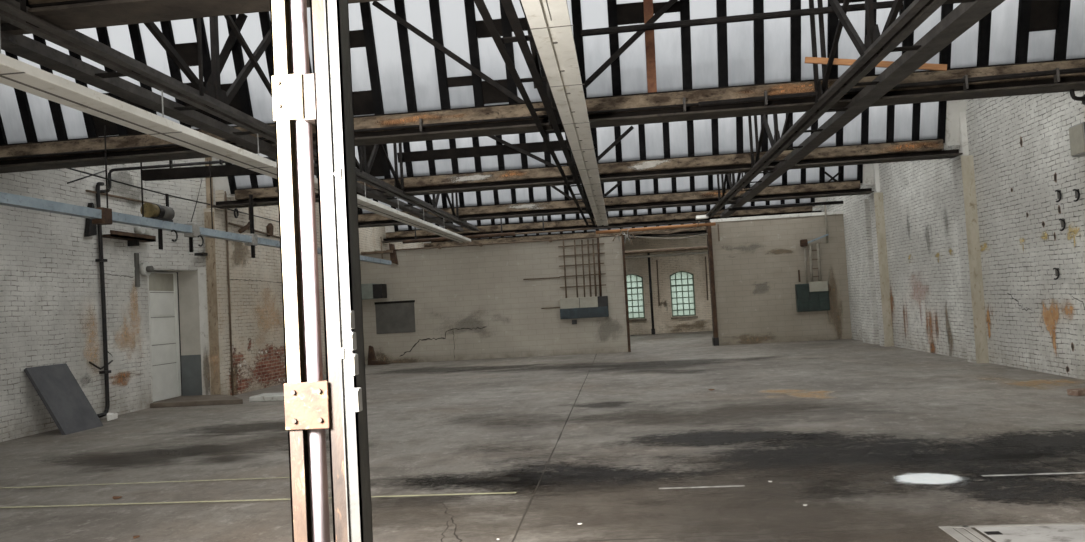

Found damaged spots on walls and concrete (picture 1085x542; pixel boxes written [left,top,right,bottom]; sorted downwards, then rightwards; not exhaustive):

peeling [223,338,286,395]
crack [400,327,485,357]
crack [440,500,462,542]
damp [372,465,996,542]